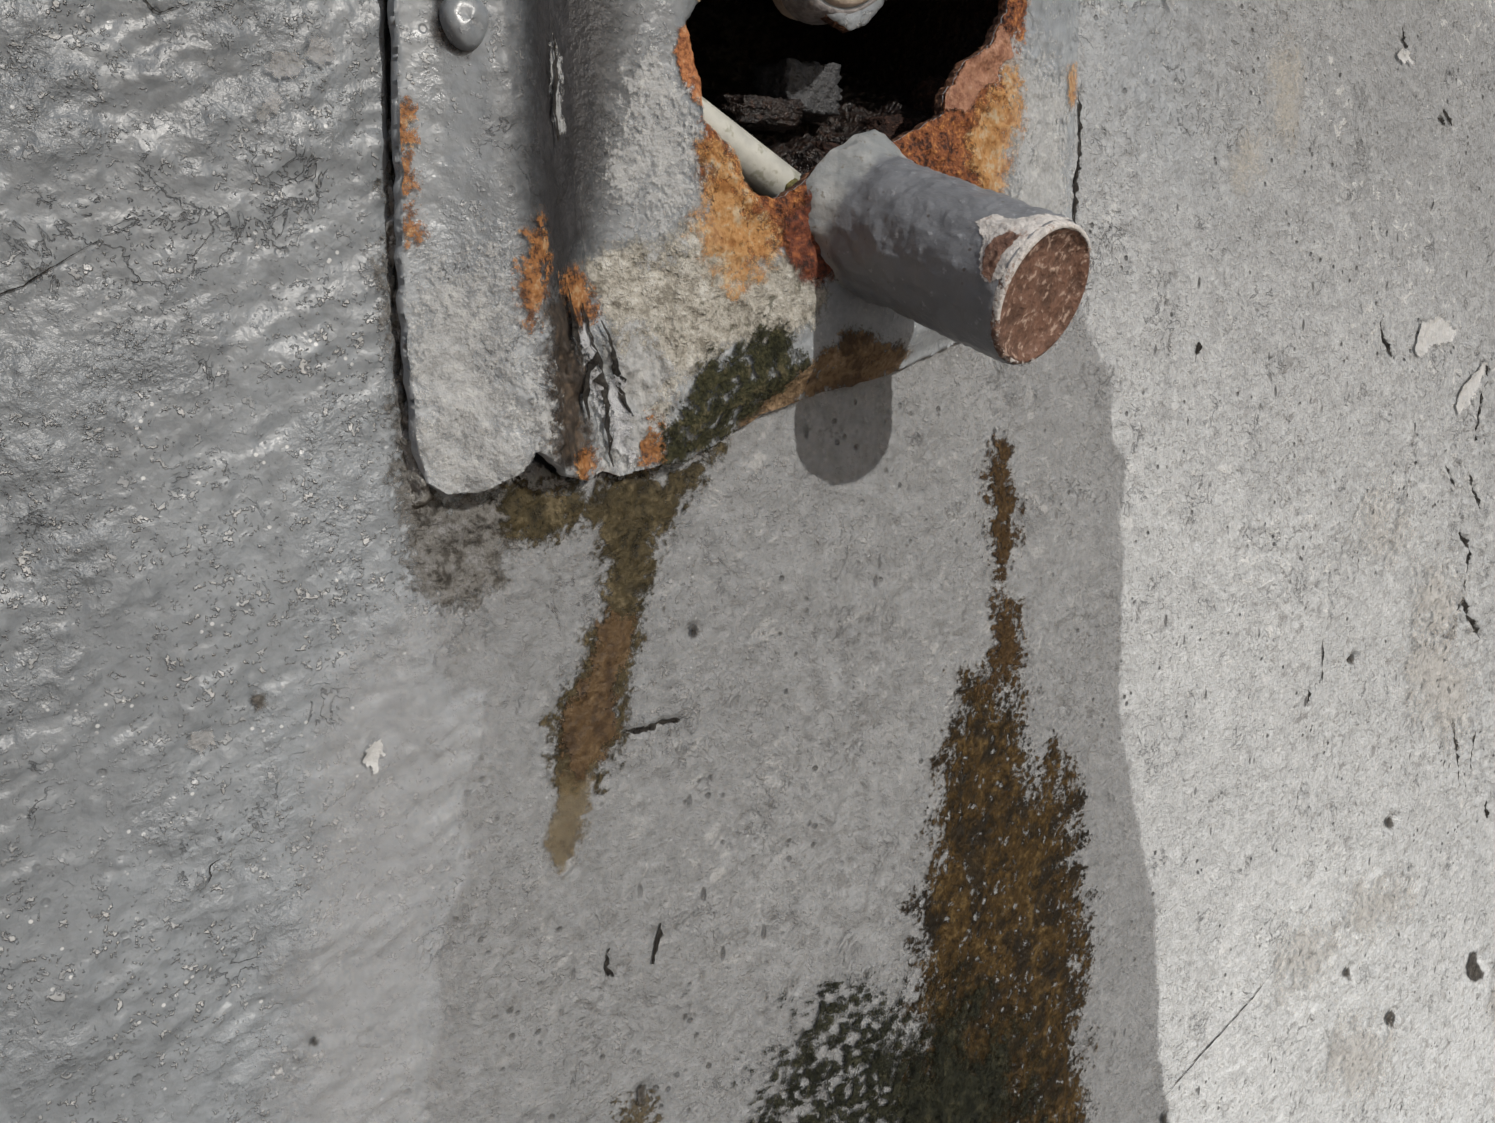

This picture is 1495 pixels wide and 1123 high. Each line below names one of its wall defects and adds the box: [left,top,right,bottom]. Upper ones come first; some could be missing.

corrosion [400,96,430,249]
corrosion [673,25,835,301]
corrosion [893,0,1031,193]
corrosion [511,211,603,334]
corrosion [574,445,602,481]
crack [568,288,634,467]
corrosion [637,409,668,469]
corrosion [733,324,913,433]
water stain [974,432,1030,707]
crack [1380,322,1392,357]
crack [1445,365,1489,637]
water stain [862,959,1064,1123]